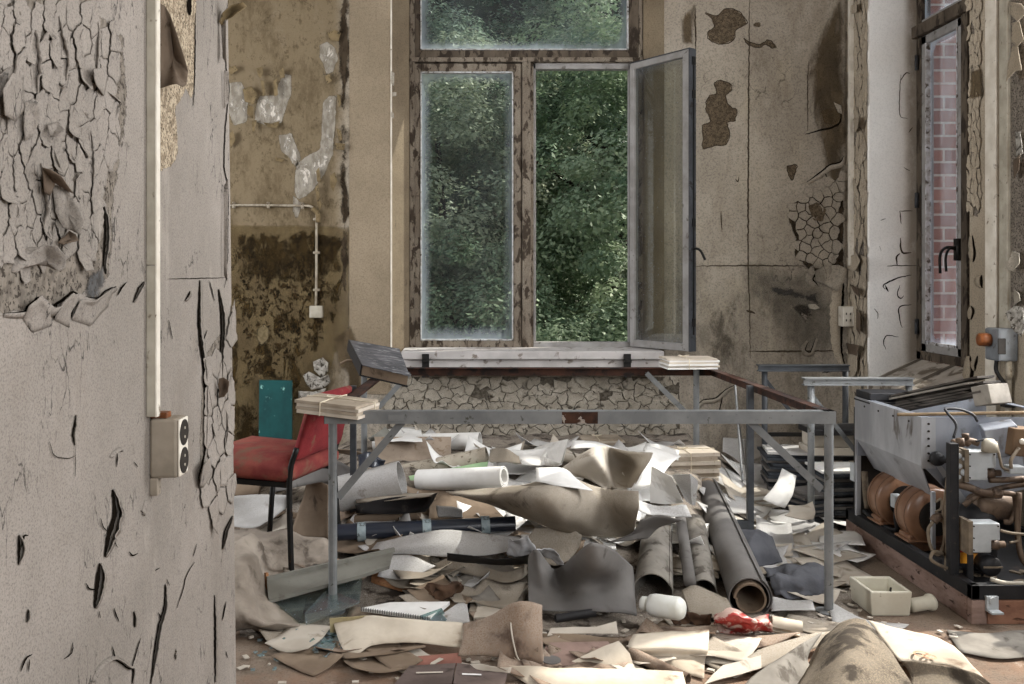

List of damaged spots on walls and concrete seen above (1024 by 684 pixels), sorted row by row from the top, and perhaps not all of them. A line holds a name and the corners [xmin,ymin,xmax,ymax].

peeling [0,0,127,333]
peeling [160,0,196,171]
spalling [702,80,738,149]
spalling [705,8,777,49]
damp [810,2,846,193]
crack [172,64,230,498]
damp [231,226,360,441]
crack [384,376,737,436]
crack [787,156,855,413]
crack [18,534,28,565]
crack [86,447,197,684]
crack [214,595,228,682]